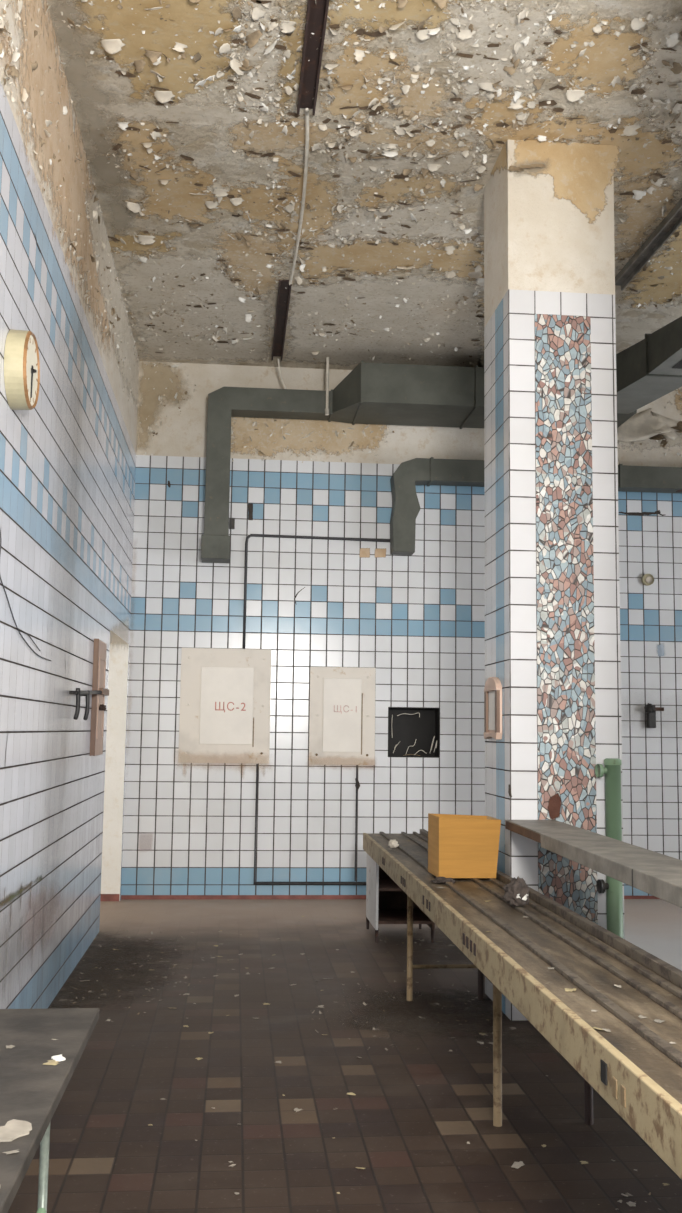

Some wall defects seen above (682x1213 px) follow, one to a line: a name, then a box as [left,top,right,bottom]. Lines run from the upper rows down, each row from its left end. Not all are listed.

peeling [0,0,682,457]
peeling [231,417,395,464]
damp [0,876,42,923]